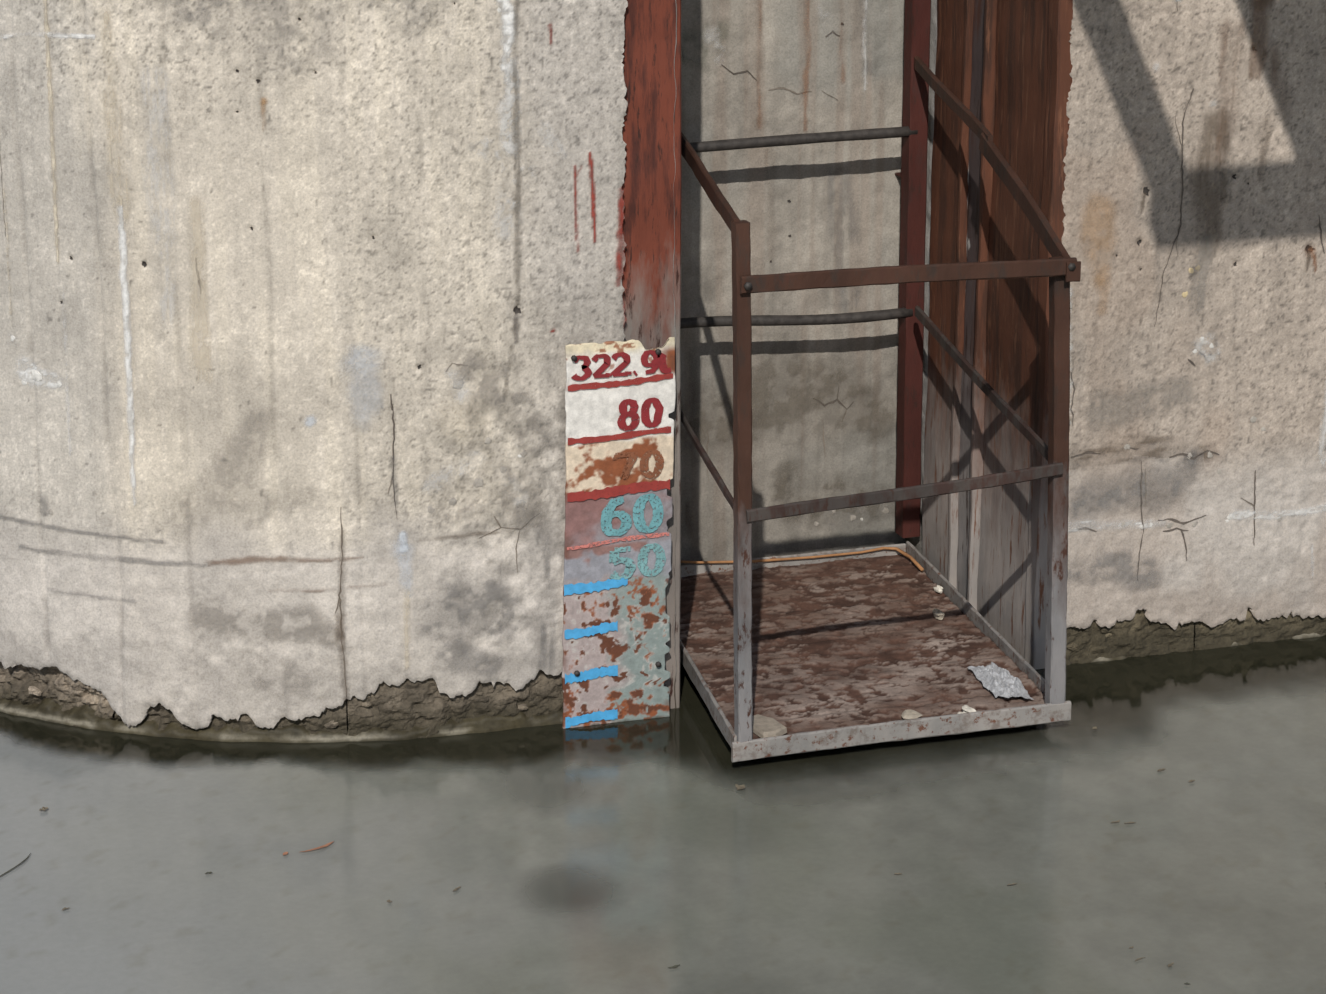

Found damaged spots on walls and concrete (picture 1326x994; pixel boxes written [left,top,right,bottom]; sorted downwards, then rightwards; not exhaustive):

crack [1154,88,1194,327]
crack [1137,461,1147,581]
crack [1242,470,1256,538]
crack [335,512,347,698]
spalling [1066,608,1326,665]
spalling [0,662,122,727]
spalling [146,703,190,731]
spalling [206,670,563,738]